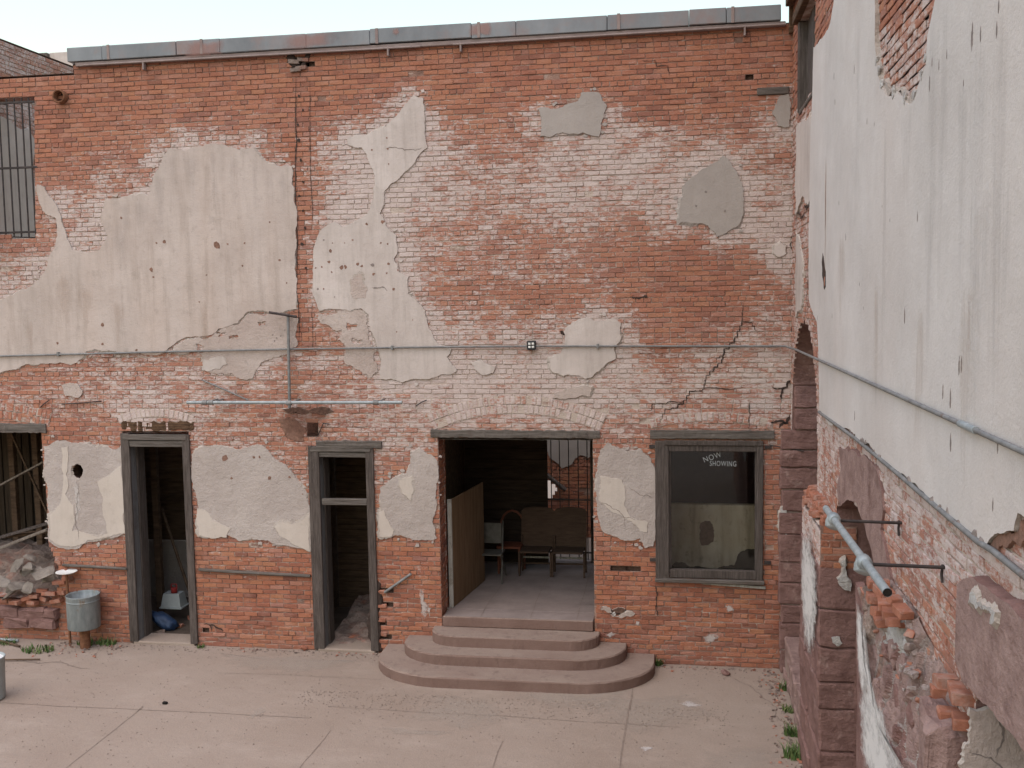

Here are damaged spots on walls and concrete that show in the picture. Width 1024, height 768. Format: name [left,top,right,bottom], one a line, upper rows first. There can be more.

spalling [875,0,947,105]
peeling [538,88,608,141]
peeling [0,89,457,386]
crack [295,84,313,346]
peeling [547,311,625,383]
crack [651,310,790,428]
peeling [41,435,125,606]
peeling [191,440,311,552]
peeling [593,442,656,550]
spalling [971,520,1024,552]
peeling [836,555,915,768]
peeling [968,584,1001,630]